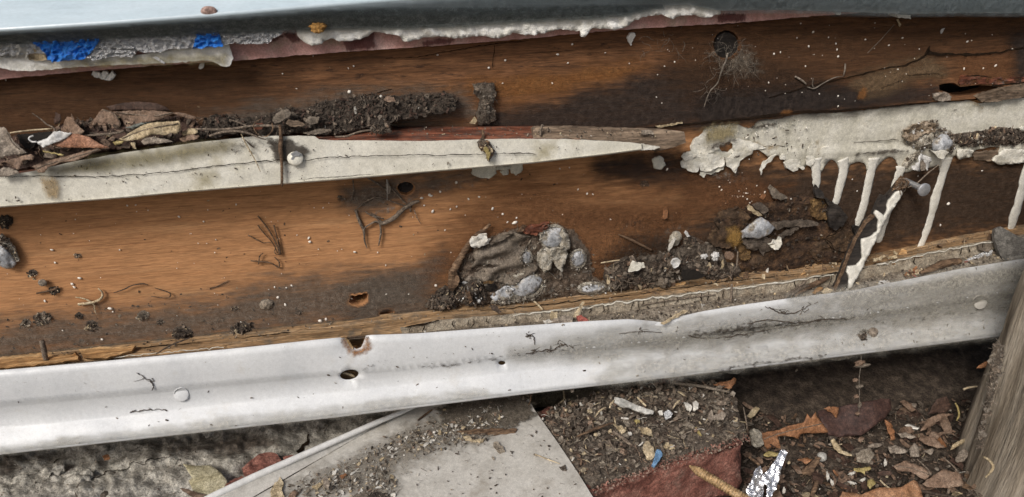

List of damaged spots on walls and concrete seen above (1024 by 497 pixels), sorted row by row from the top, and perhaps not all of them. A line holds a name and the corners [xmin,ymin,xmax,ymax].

crack [641,46,1024,151]
damp [0,152,1024,356]
corrosion [342,337,371,356]